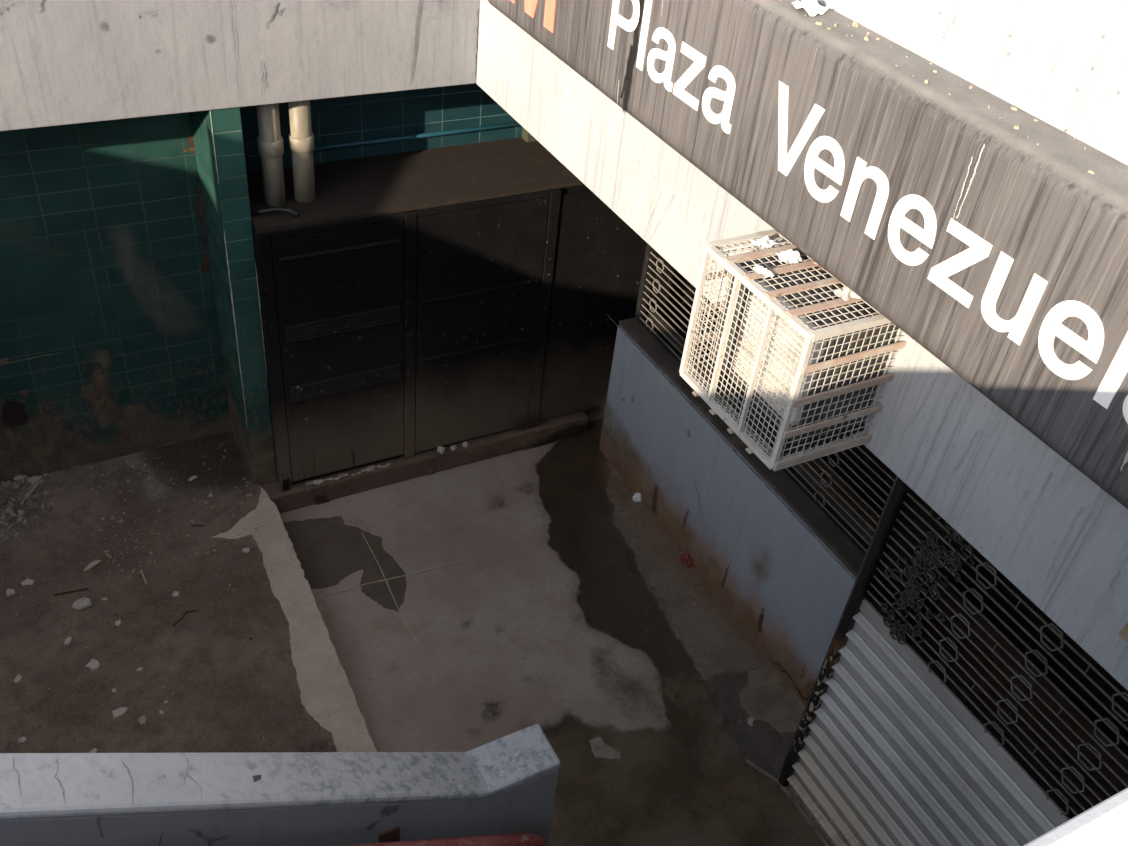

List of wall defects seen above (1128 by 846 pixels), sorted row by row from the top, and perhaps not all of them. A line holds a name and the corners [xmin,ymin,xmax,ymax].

water stain [617,0,644,112]
water stain [81,349,245,501]
water stain [525,419,795,779]